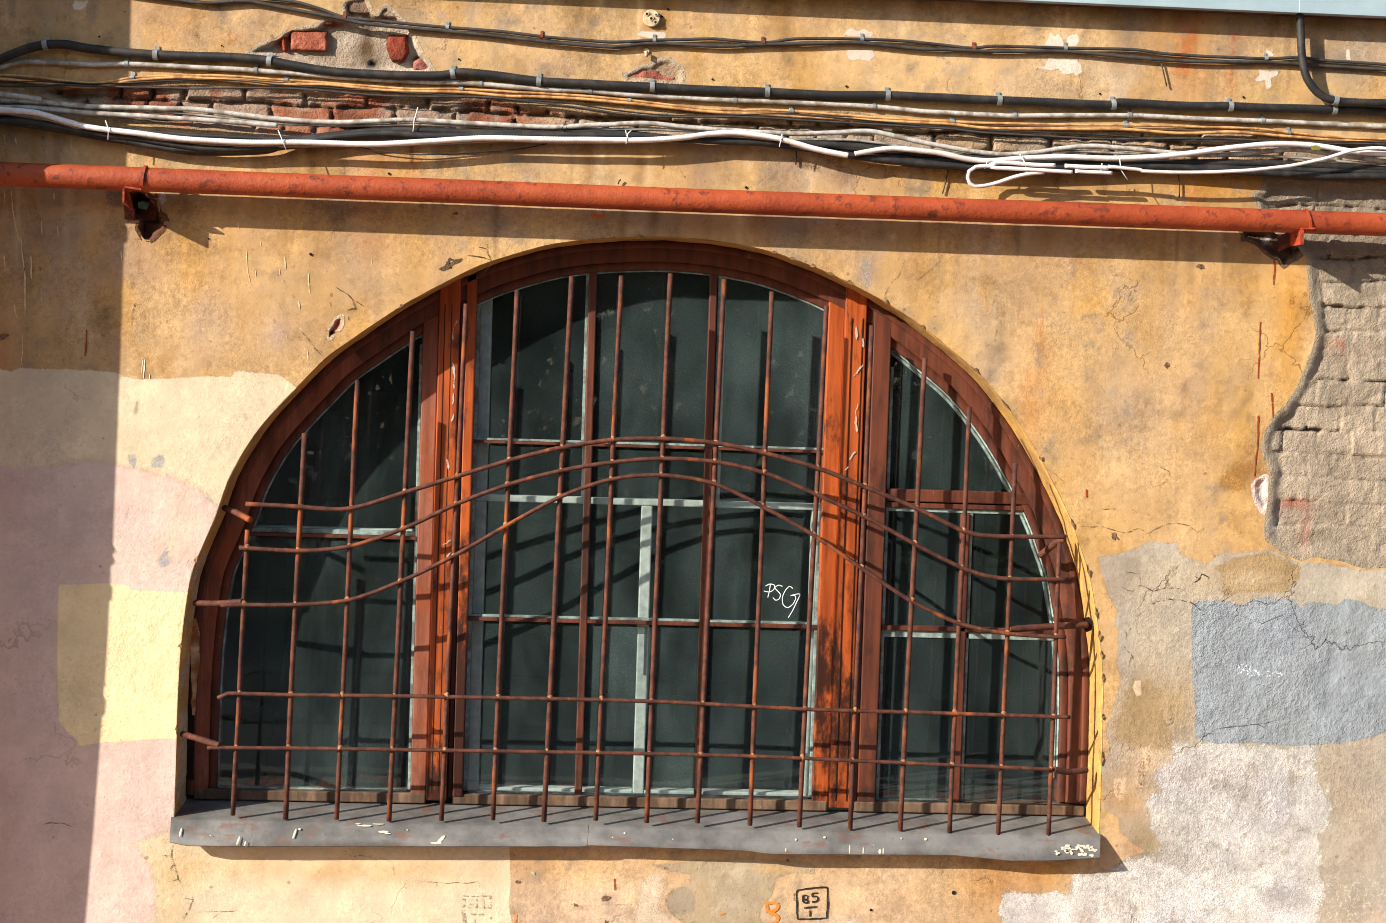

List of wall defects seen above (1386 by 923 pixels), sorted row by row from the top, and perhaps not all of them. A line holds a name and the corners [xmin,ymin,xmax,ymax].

spalling [245,0,436,71]
peeling [637,31,666,39]
spalling [621,57,686,84]
peeling [844,28,875,61]
peeling [1039,33,1082,76]
peeling [1255,50,1278,90]
spalling [27,83,1386,213]
flaking render [1001,231,1386,923]